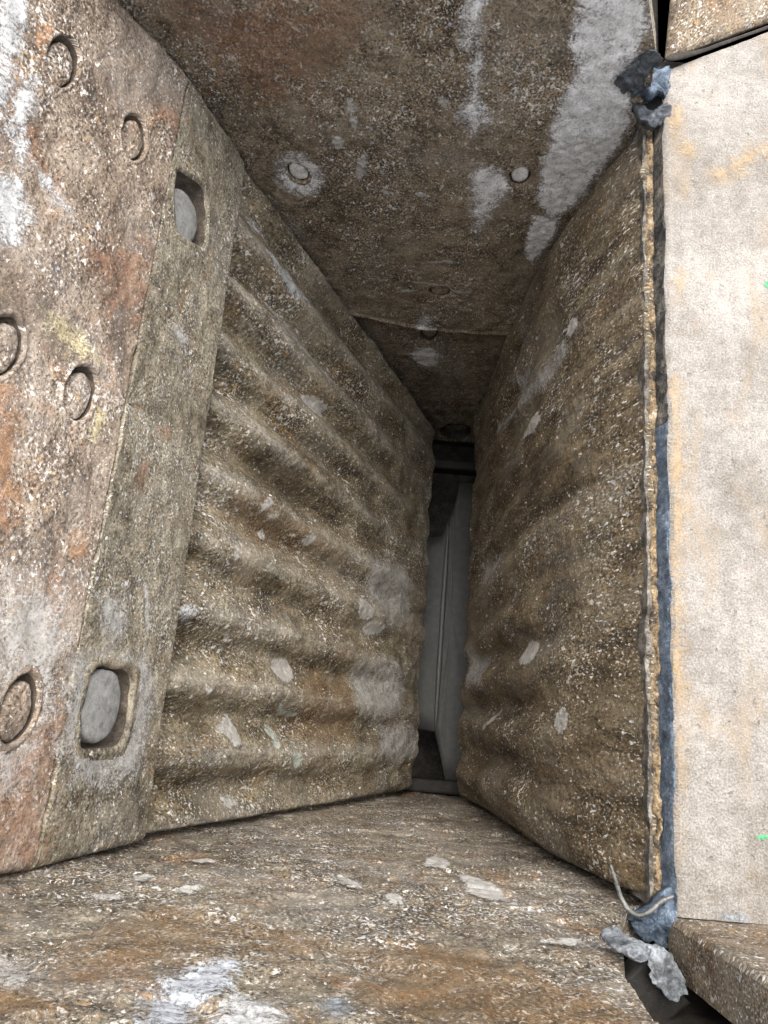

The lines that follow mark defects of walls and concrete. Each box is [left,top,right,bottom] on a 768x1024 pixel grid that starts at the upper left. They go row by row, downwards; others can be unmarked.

leakage [0,0,72,248]
leakage [469,165,511,233]
peeling [525,0,650,261]